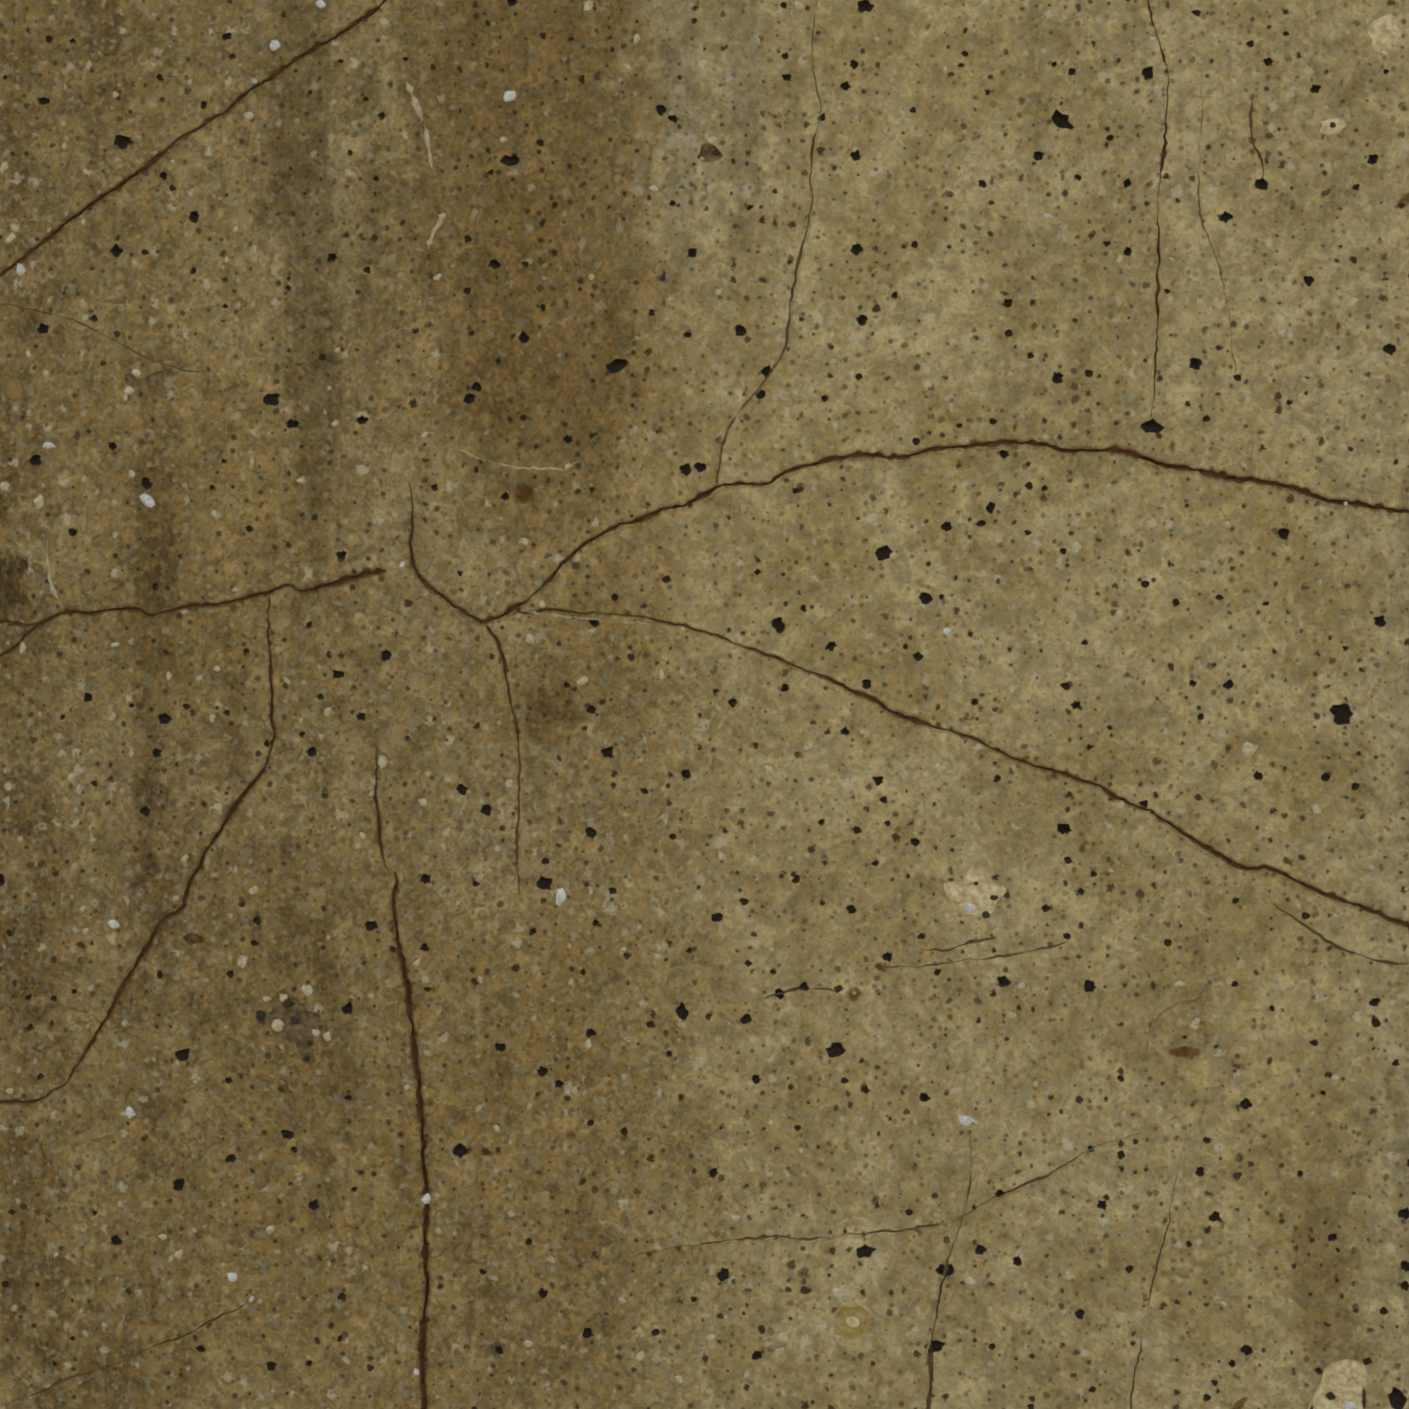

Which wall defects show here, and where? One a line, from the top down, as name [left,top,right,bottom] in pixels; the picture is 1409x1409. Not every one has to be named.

damp [0,539,58,620]
crack [0,0,1409,1104]
crack [370,743,431,1409]